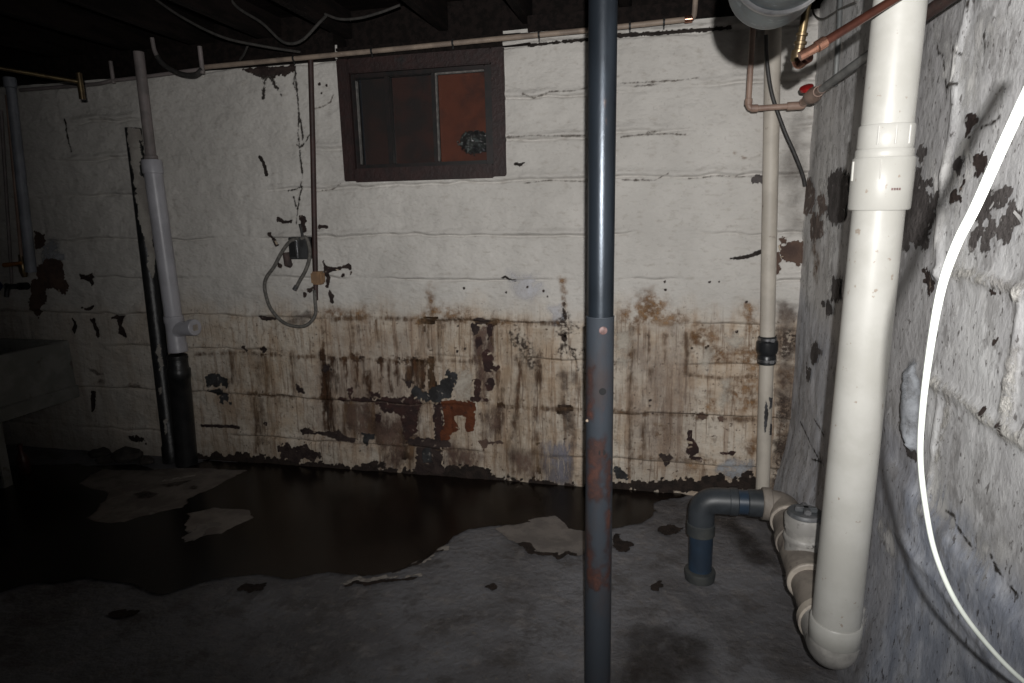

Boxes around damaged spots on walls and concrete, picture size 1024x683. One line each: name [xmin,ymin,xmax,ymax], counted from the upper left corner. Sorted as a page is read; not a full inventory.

peeling [242,64,296,79]
peeling [776,167,849,274]
peeling [968,184,1023,258]
peeling [28,231,69,319]
leakage [514,277,541,298]
peeling [277,318,503,475]
leakage [454,371,472,399]
leakage [772,304,796,487]
leakage [197,400,585,487]
rust [587,440,611,545]
leakage [612,471,756,493]
peeling [686,430,702,462]